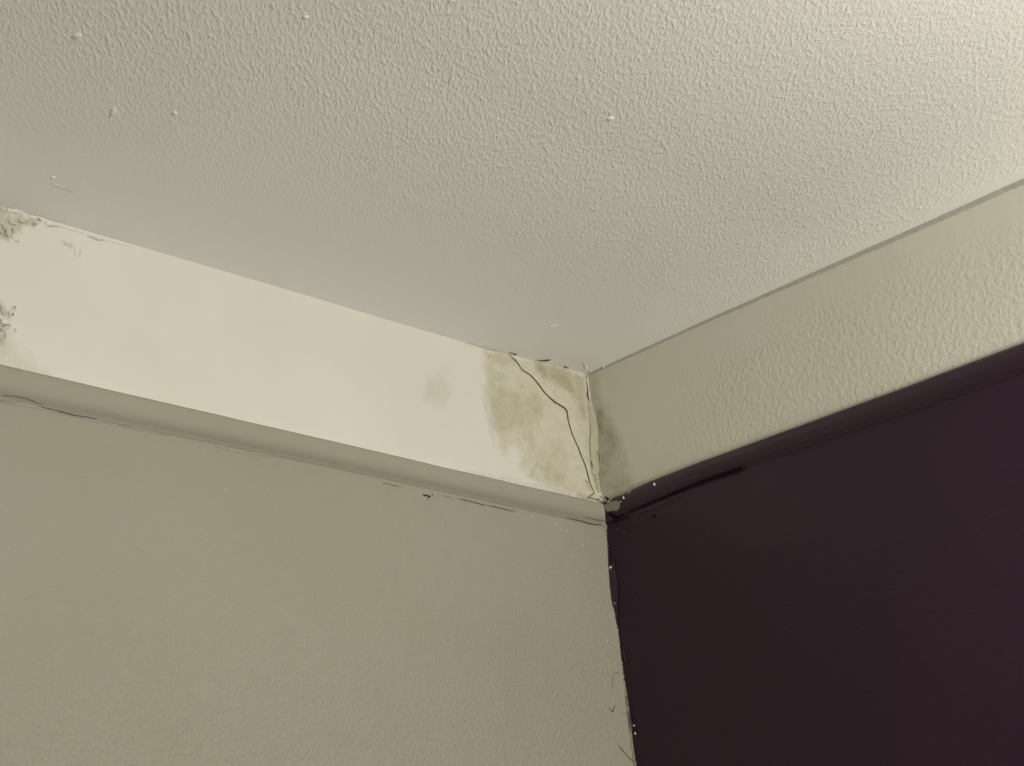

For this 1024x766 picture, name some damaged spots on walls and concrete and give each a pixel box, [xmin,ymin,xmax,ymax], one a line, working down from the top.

peeling [0,206,132,247]
crack [467,343,608,525]